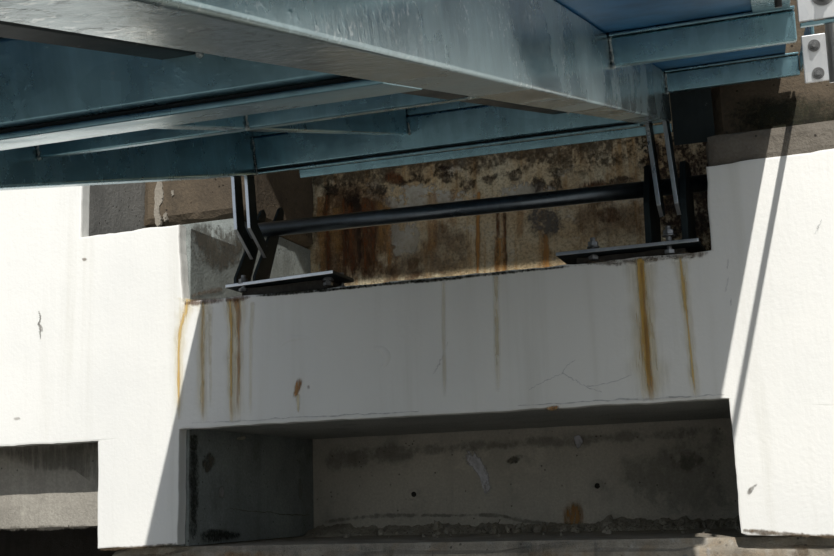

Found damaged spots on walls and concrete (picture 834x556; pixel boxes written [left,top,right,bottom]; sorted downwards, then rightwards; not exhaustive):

corrosion [315,224,419,285]
corrosion [495,213,507,271]
corrosion [177,296,244,396]
corrosion [637,259,650,384]
spalling [302,515,741,538]